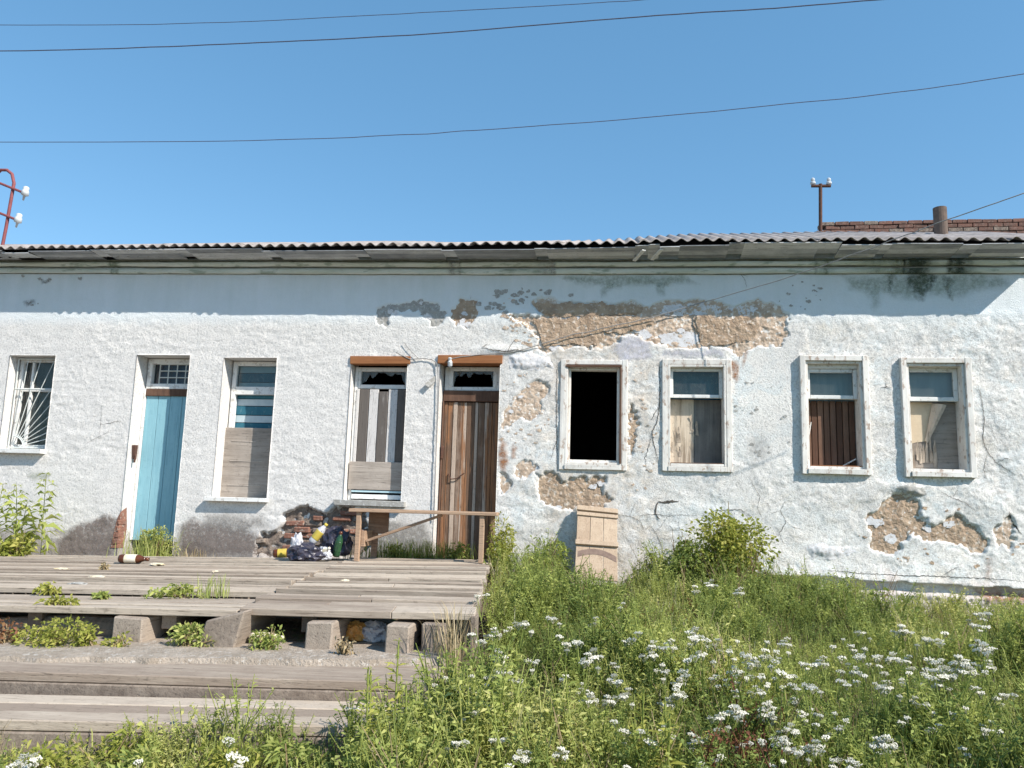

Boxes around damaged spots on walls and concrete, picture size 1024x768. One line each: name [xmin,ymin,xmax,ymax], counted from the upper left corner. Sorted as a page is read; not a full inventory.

damp [890,258,967,295]
spalling [376,281,823,357]
peeling [499,373,550,443]
spalling [500,460,612,510]
spalling [859,494,1024,568]